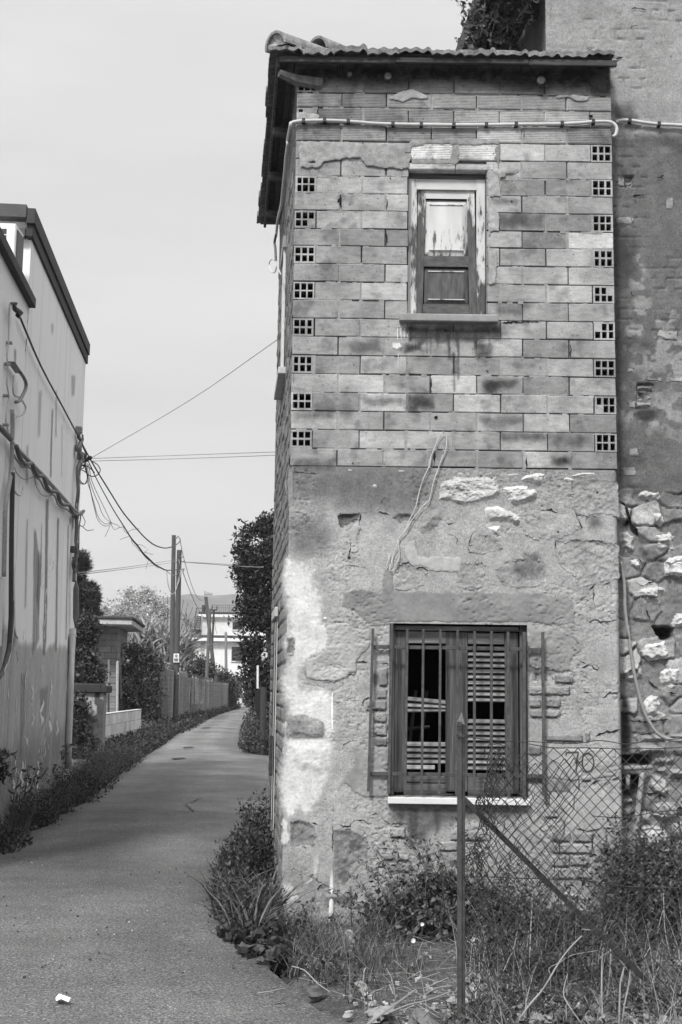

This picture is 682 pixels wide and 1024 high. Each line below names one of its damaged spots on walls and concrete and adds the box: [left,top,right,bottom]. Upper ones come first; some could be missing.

water stain [397,327,500,373]
spalling [338,512,360,526]
spalling [439,448,640,594]
flaking render [636,491,682,604]
flaking render [671,613,682,627]
flaking render [623,641,679,718]
peeling [278,557,346,917]